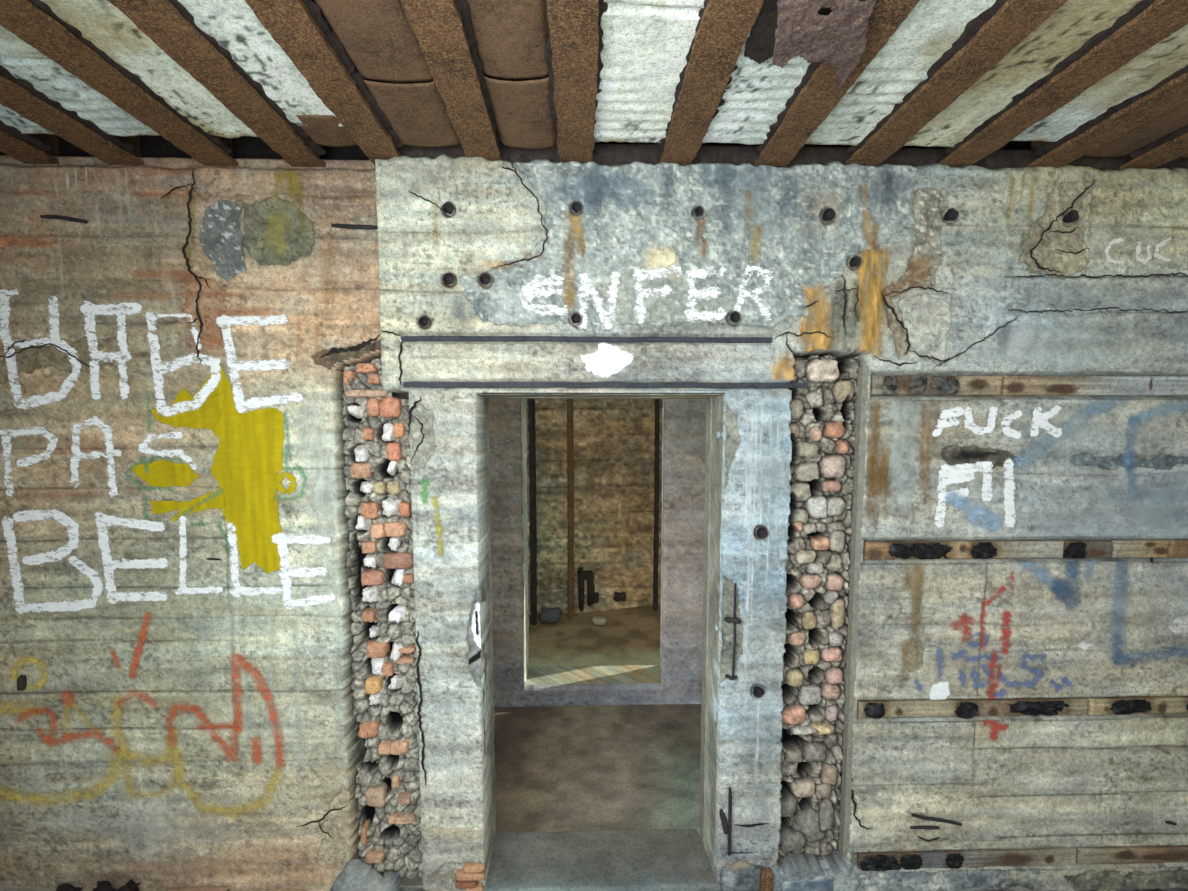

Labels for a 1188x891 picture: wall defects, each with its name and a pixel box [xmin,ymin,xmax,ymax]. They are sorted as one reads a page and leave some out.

rust [168,0,326,156]
rust [303,0,404,149]
rust [698,0,876,152]
crack [160,169,211,364]
spalling [182,195,315,344]
crack [492,157,548,268]
rust [850,224,888,353]
crack [774,274,1187,368]
crack [1015,179,1188,278]
spalling [307,340,435,891]
spalling [467,588,481,687]
spalling [778,355,859,856]